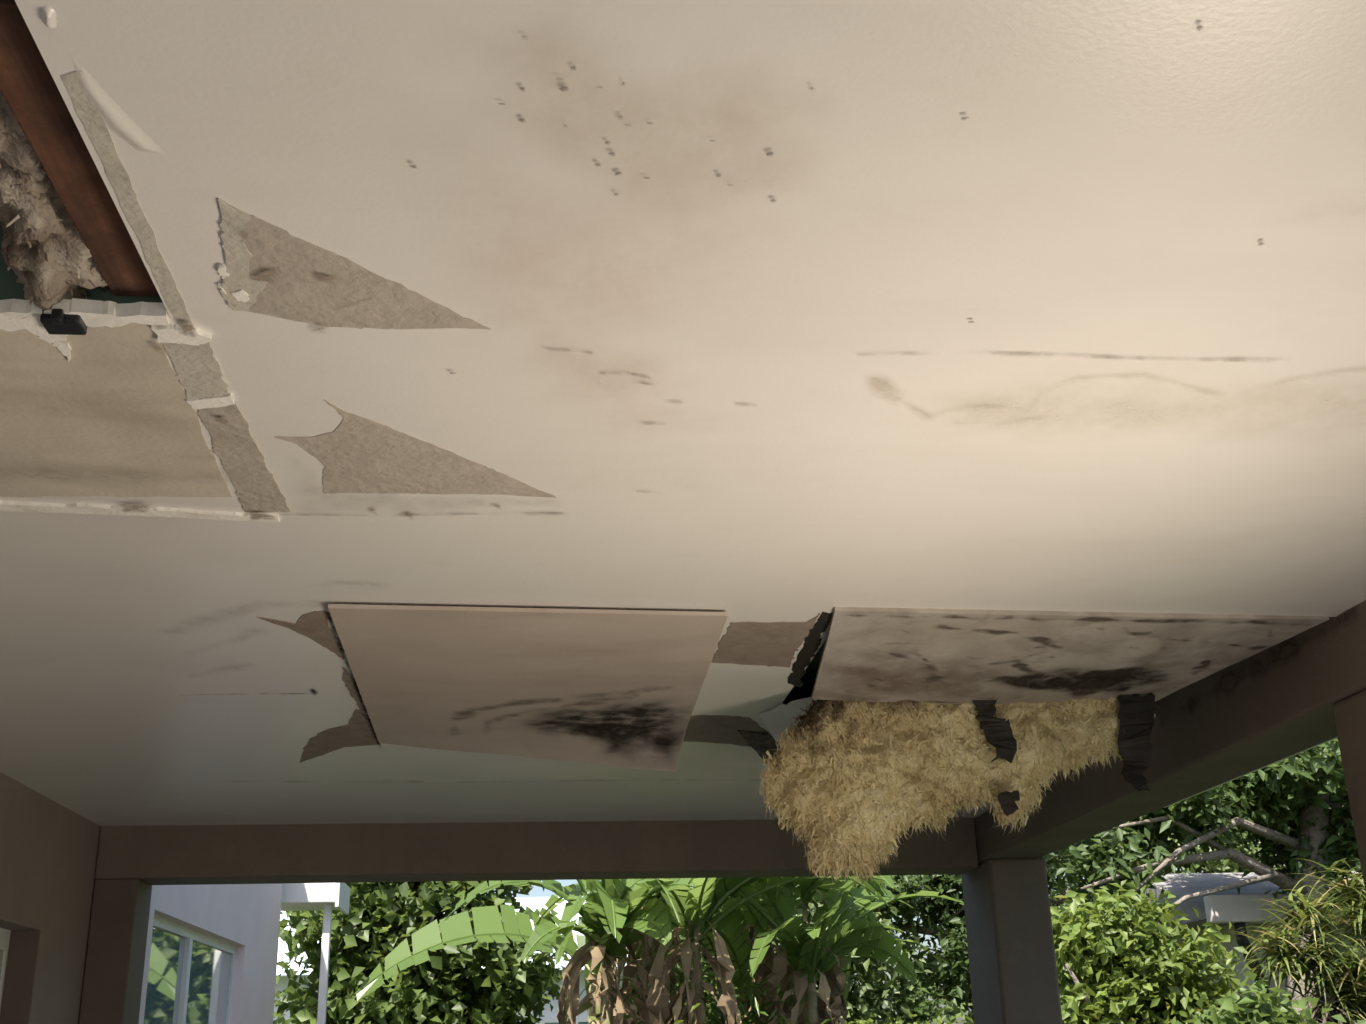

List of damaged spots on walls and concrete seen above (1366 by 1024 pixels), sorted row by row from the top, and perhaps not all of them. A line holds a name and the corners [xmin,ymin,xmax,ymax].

spalling [217,198,491,330]
peeling [0,317,232,497]
flaking render [274,399,557,511]
leakage [534,705,677,750]
leakage [995,661,1162,696]
leakage [1132,620,1193,635]